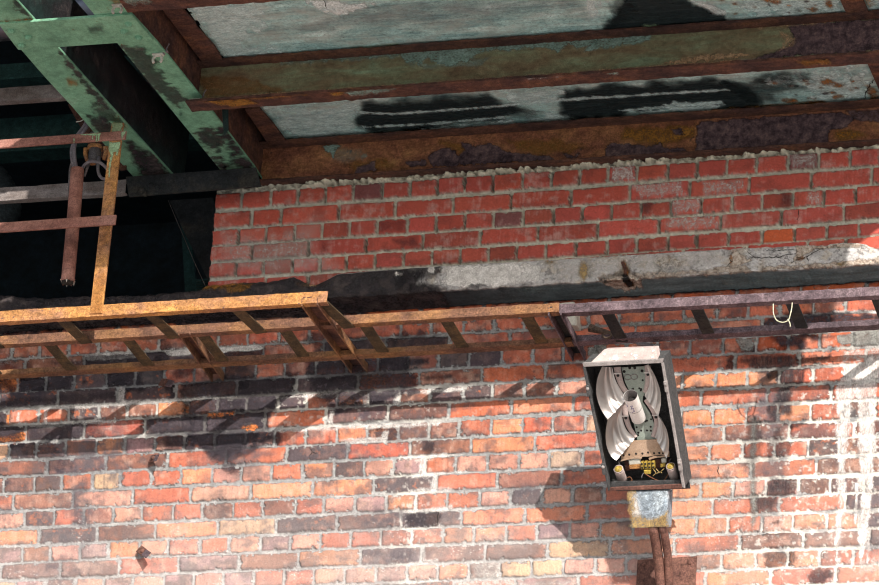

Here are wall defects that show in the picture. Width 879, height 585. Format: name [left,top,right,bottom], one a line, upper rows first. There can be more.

water stain [190,3,282,57]
water stain [306,0,484,22]
water stain [604,0,727,30]
water stain [741,0,841,18]
water stain [278,65,870,138]
water stain [397,267,444,296]
spalling [599,243,879,292]
crack [728,246,832,265]
water stain [140,416,193,450]
water stain [205,431,281,474]
water stain [834,346,879,565]